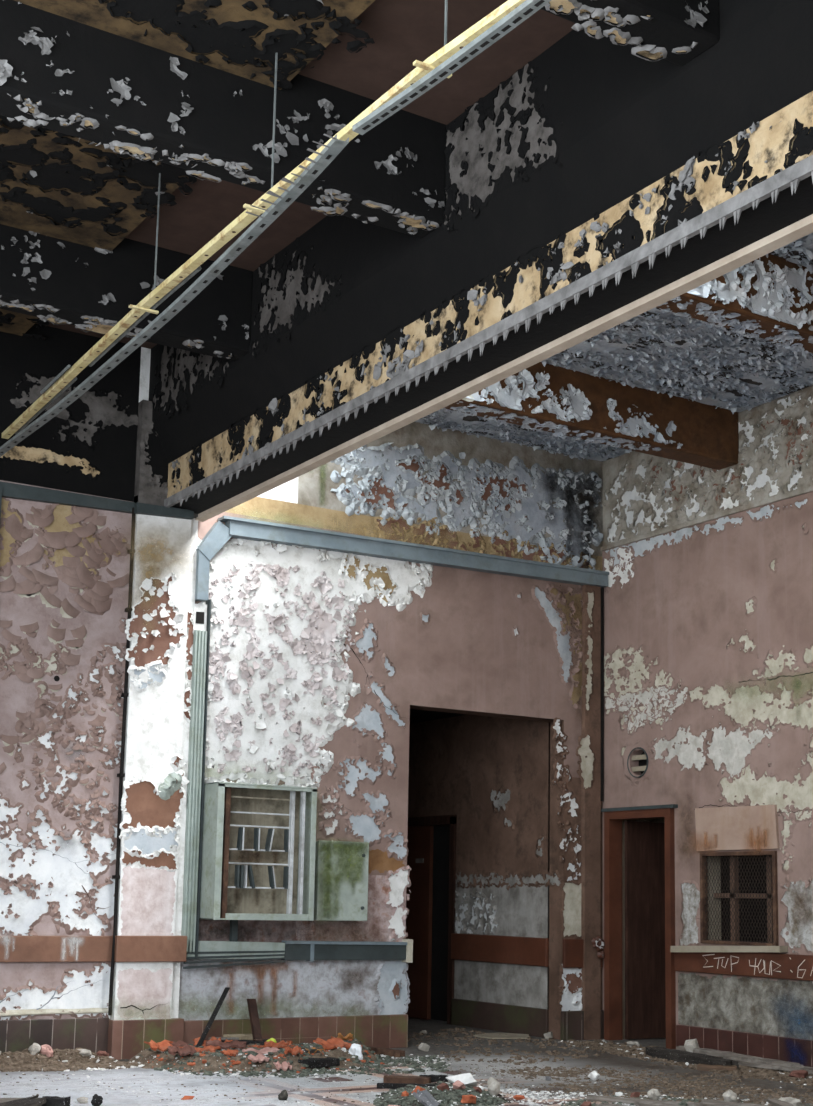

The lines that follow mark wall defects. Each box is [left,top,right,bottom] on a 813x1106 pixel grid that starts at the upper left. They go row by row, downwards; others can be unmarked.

peeling [545,0,698,61]
peeling [684,1,709,28]
peeling [647,156,695,232]
peeling [537,221,622,297]
peeling [268,398,286,437]
mould [548,477,598,565]
peeling [330,233,813,959]
peeling [0,538,433,942]
peeling [0,962,173,1020]
peeling [373,960,410,1015]
peeling [558,962,583,1014]
peeling [678,972,813,1040]